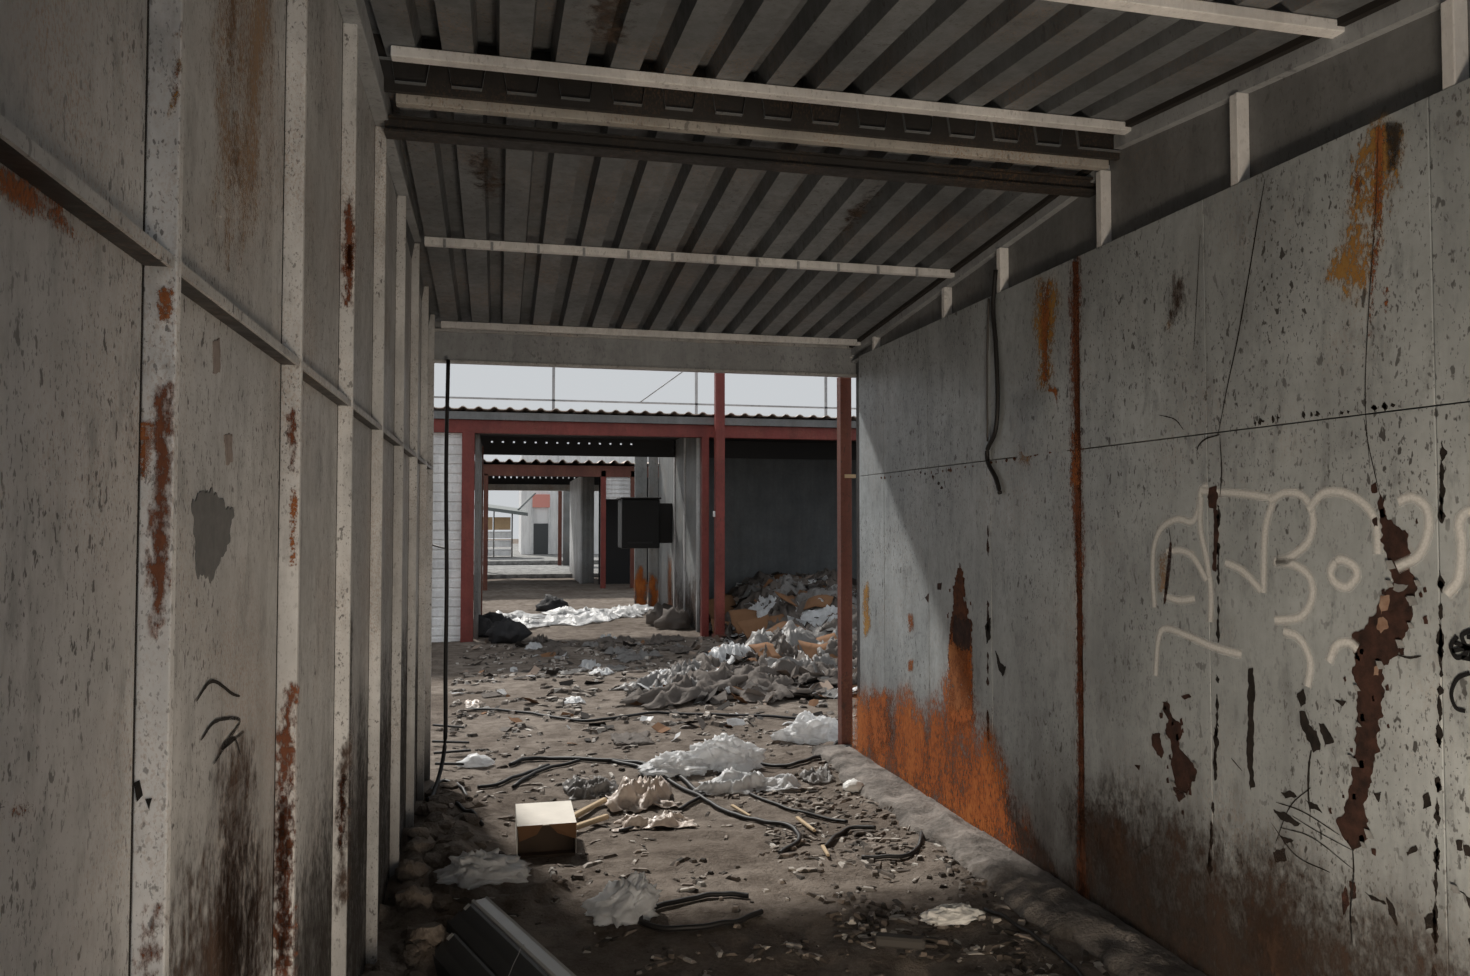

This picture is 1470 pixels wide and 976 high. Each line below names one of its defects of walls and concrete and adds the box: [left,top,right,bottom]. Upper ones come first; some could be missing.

corrosion [156,286,175,323]
corrosion [1325,119,1404,466]
corrosion [140,382,174,639]
corrosion [851,256,1090,900]
peeling [1207,486,1221,643]
peeling [1438,442,1447,523]
corrosion [135,625,418,976]
peeling [1151,668,1255,815]
peeling [1272,483,1445,943]
peeling [1406,776,1470,976]